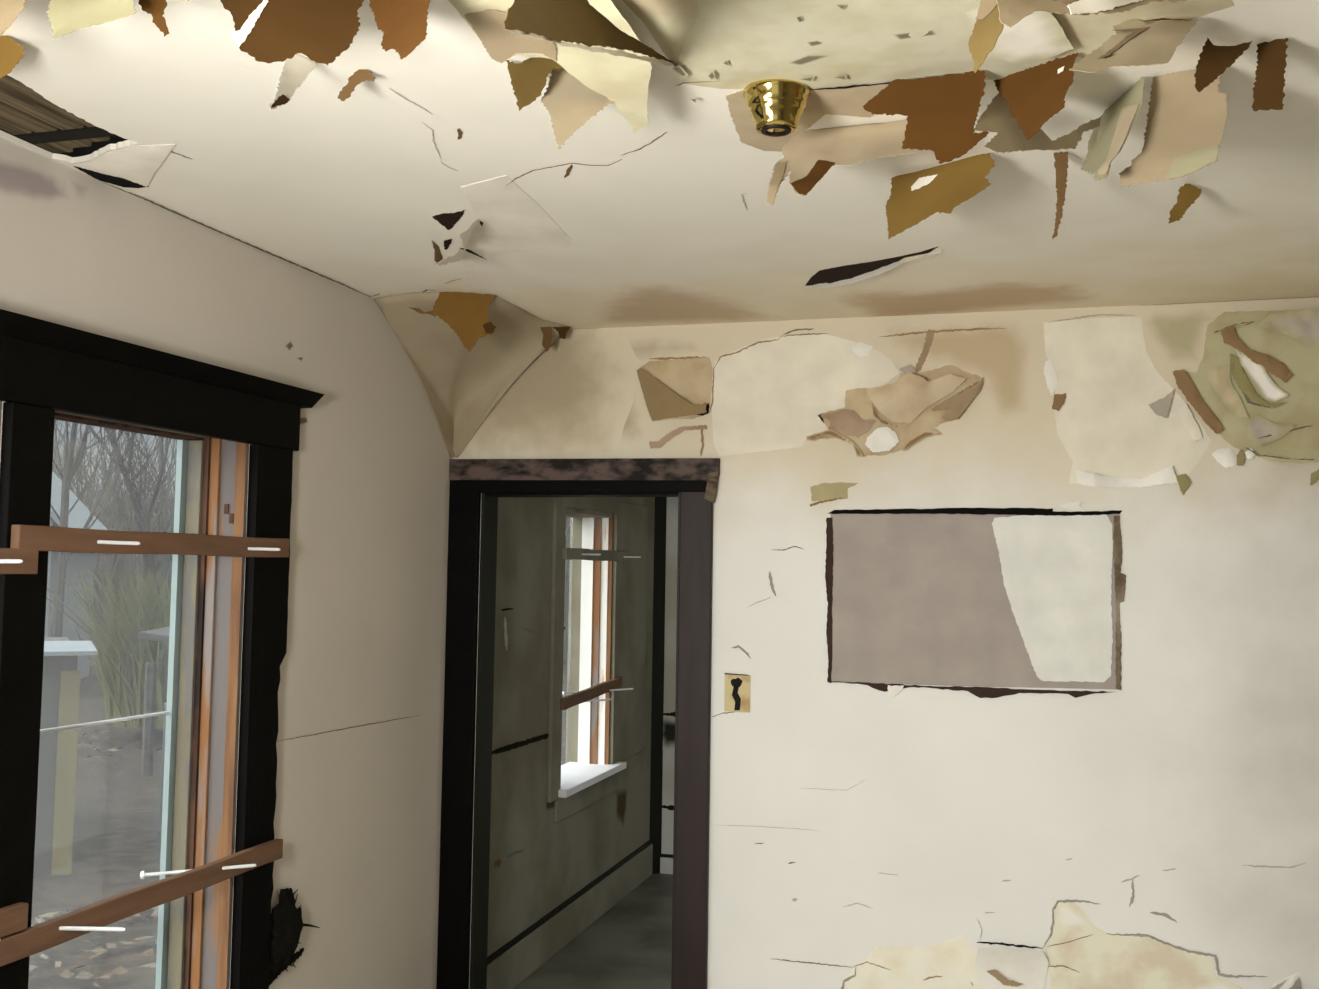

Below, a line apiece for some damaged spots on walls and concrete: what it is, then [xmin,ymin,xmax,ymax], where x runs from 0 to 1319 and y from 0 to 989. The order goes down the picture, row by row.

flaking render [623,0,1234,152]
spalling [56,136,127,157]
crack [389,88,463,171]
crack [505,133,665,187]
peeling [806,365,984,457]
peeling [1172,308,1319,463]
crack [1242,861,1305,869]
crack [977,868,1177,973]